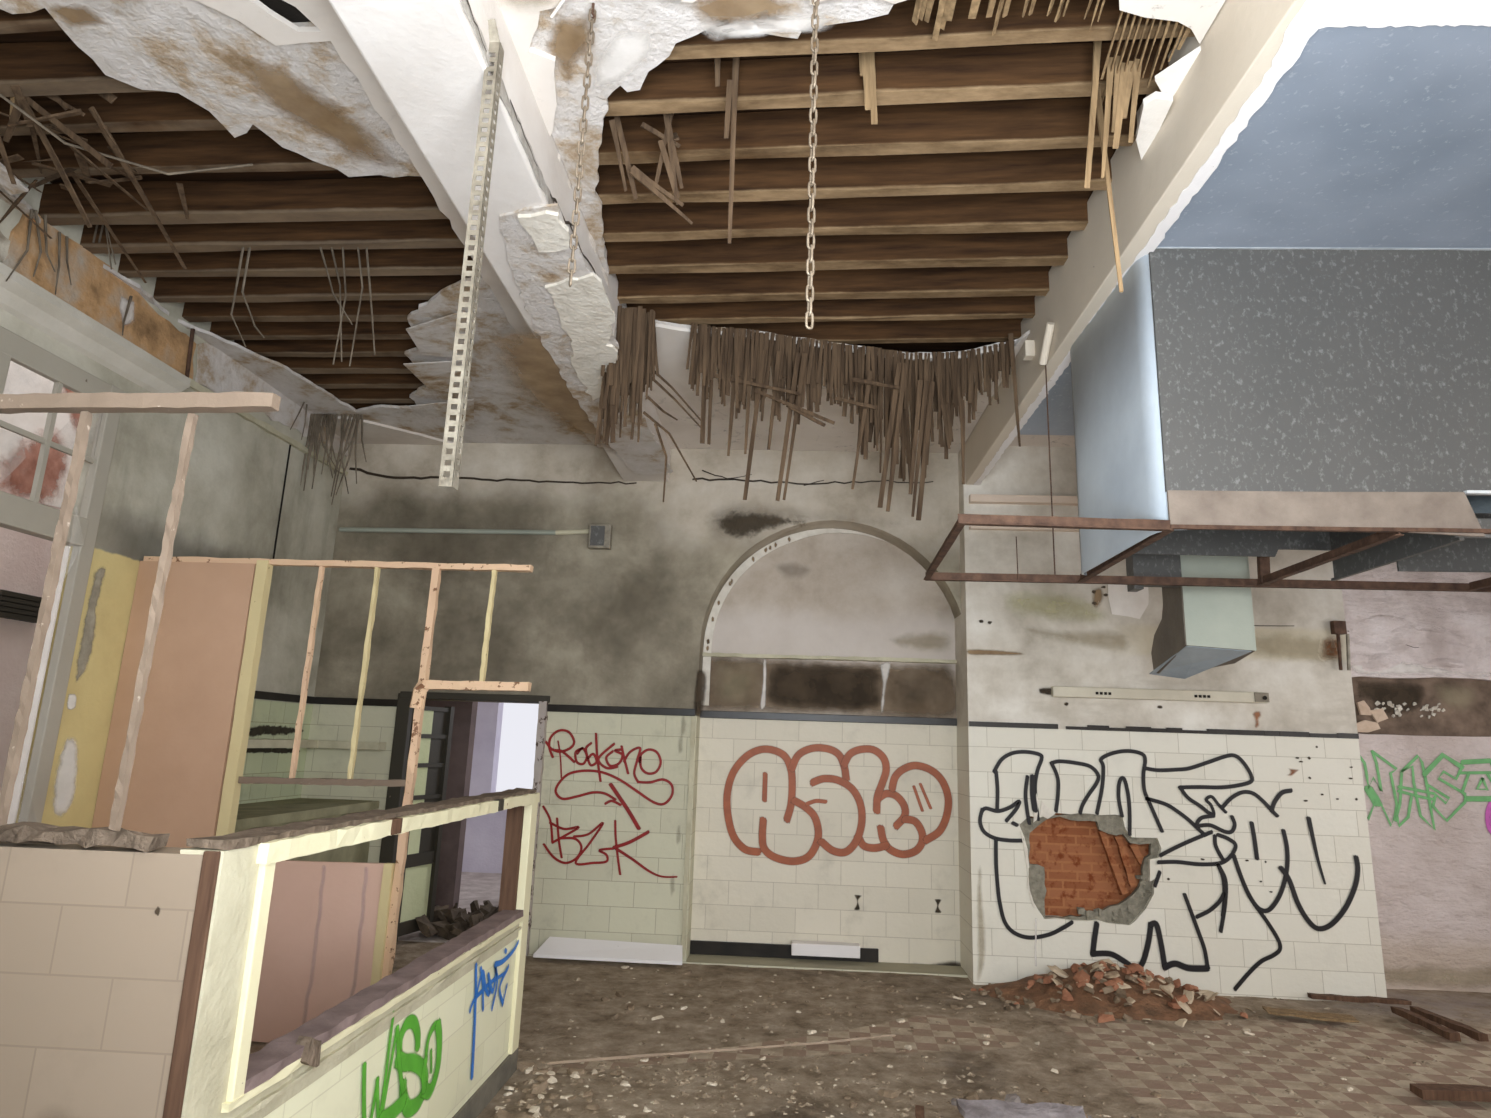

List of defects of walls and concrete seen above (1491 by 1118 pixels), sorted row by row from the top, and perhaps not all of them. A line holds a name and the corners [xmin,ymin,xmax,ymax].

spalling [1082,0,1491,332]
flaking render [0,0,893,476]
flaking render [902,339,1018,356]
peeling [0,413,80,508]
spalling [974,350,1071,485]
flaking render [1352,677,1491,737]
spalling [1020,793,1170,924]